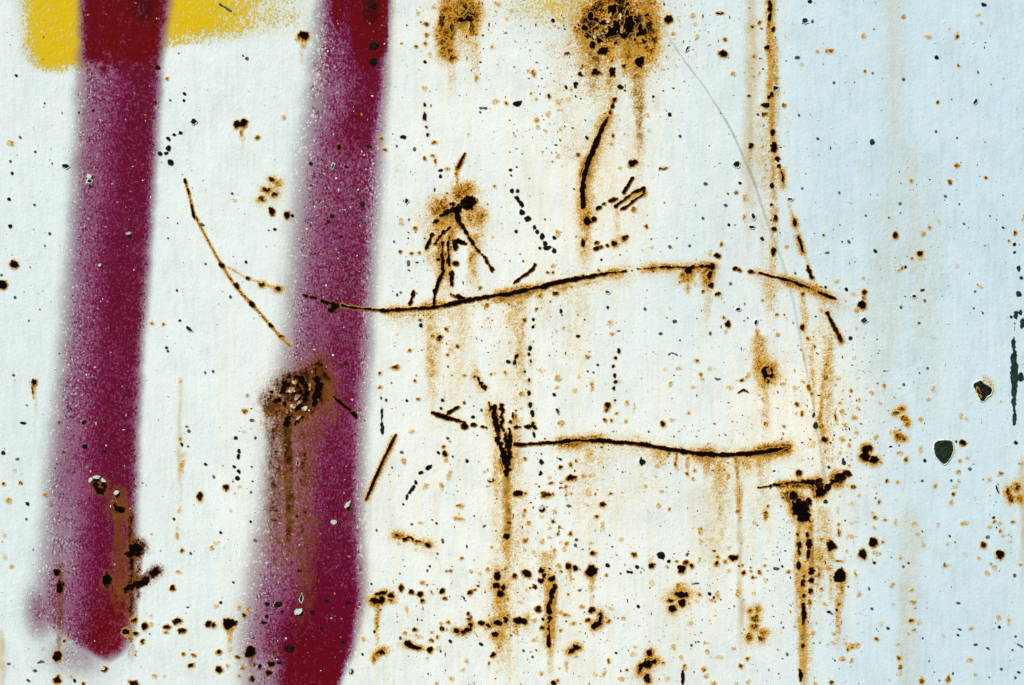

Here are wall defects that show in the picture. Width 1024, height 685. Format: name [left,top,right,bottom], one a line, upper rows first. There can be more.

corrosion [414,0,513,81]
corrosion [564,0,675,152]
corrosion [398,140,495,305]
corrosion [112,492,163,652]
corrosion [241,354,358,580]
corrosion [361,588,408,663]
corrosion [402,369,583,682]
corrosion [618,646,669,685]
corrosion [663,582,719,616]
corrosion [746,0,923,685]
peeling [933,439,967,466]
peeling [973,379,994,402]